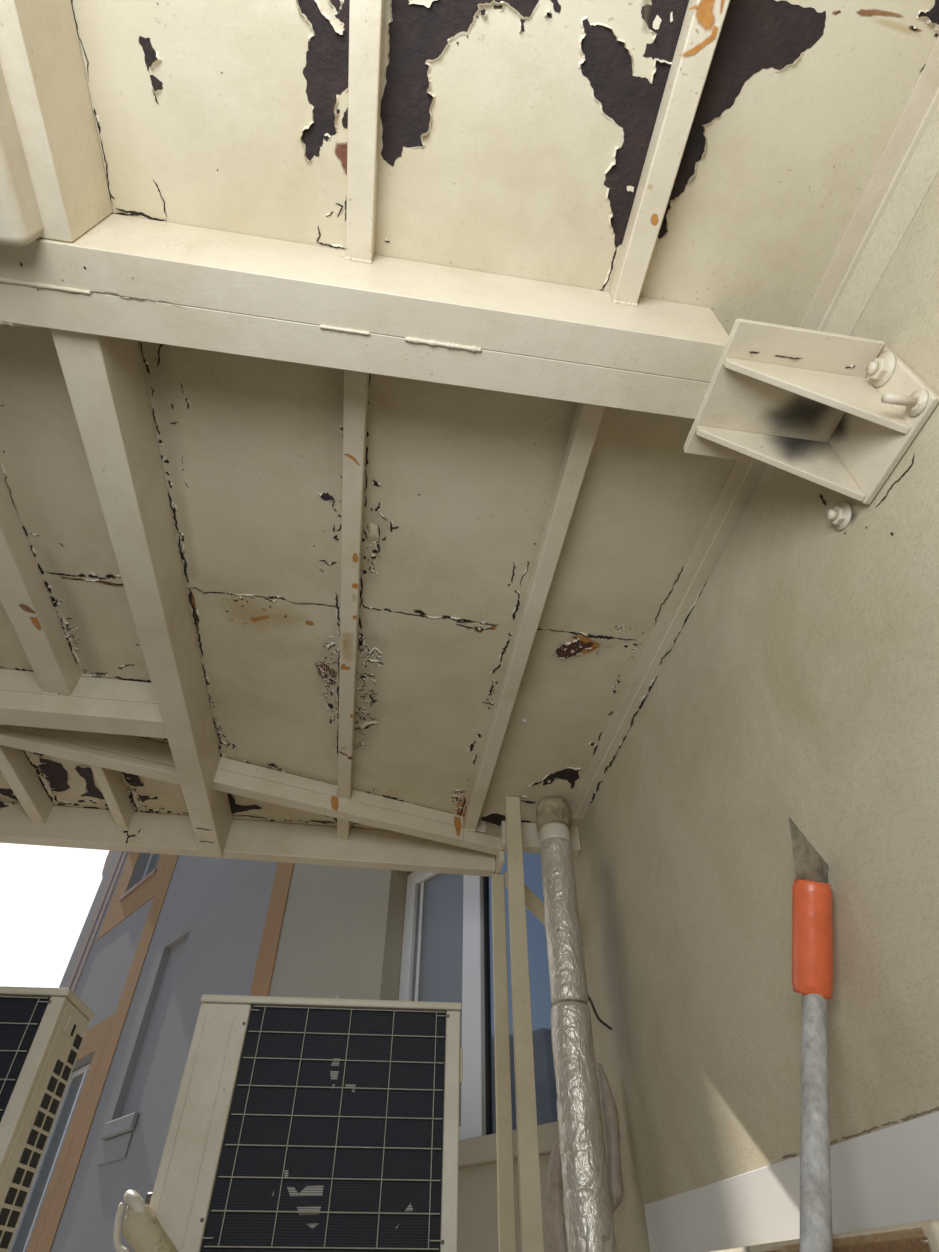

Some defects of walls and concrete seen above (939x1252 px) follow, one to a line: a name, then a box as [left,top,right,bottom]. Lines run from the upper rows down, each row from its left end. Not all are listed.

peeling [295,0,350,163]
peeling [380,0,561,167]
peeling [578,0,689,247]
corrosion [682,0,724,56]
peeling [658,0,826,240]
peeling [916,0,939,34]
crack [0,450,151,683]
crack [139,341,707,816]
peeling [25,752,105,800]
peeling [228,793,263,814]
peeling [479,812,505,826]
peeling [522,767,581,805]